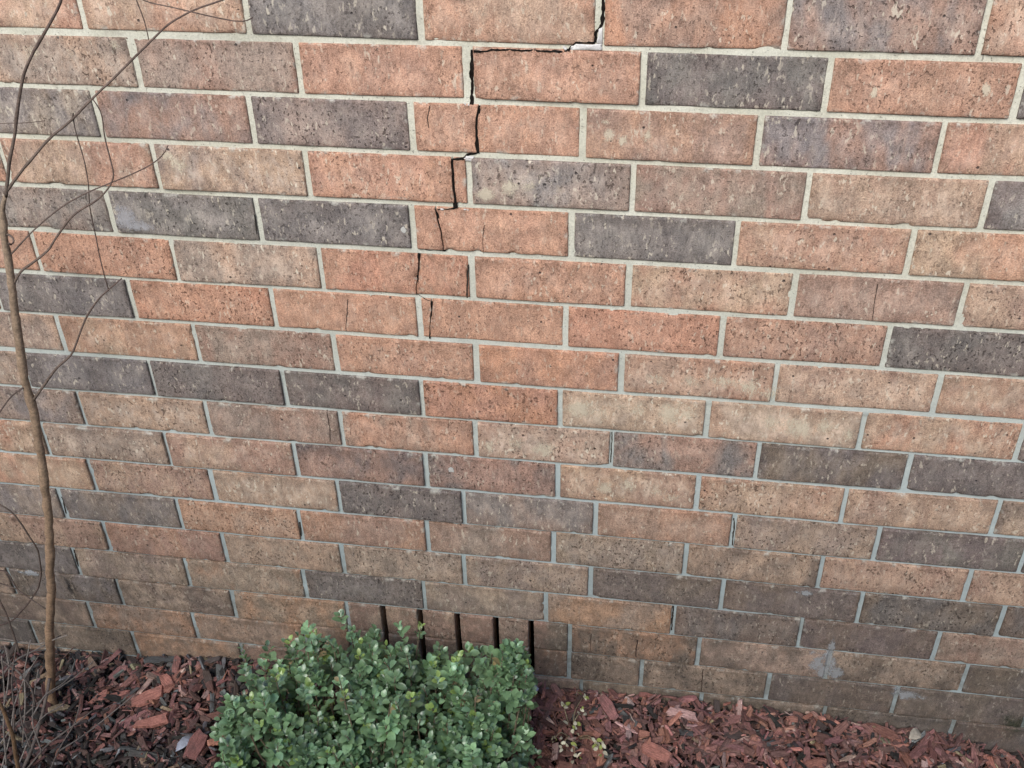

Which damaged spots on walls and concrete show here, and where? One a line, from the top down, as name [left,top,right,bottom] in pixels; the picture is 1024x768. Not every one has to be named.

crack [416,0,605,339]